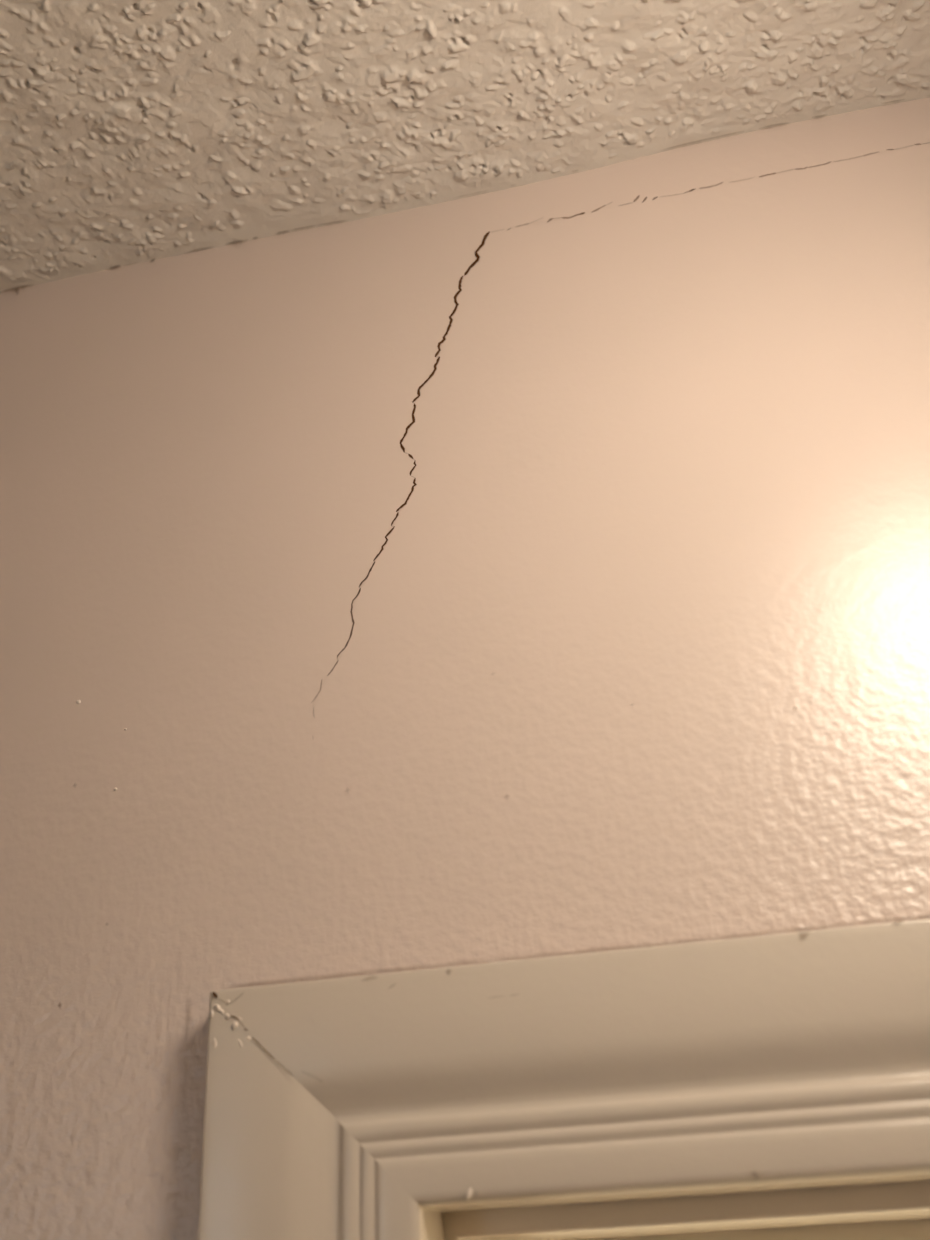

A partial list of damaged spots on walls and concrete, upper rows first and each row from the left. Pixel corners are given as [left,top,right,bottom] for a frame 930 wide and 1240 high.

crack [334,231,490,666]
crack [212,992,275,1060]